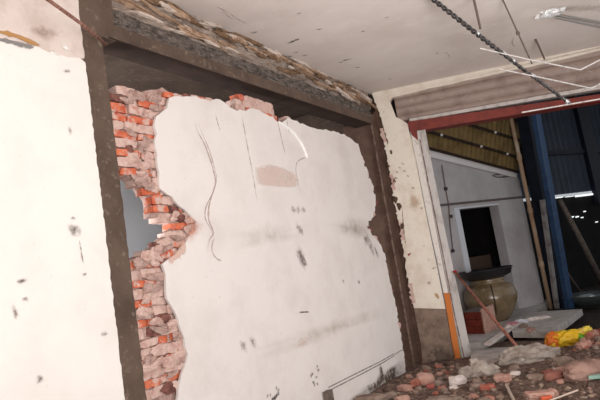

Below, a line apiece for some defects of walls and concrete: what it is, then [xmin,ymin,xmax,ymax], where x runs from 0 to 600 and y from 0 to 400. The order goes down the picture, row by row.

spalling [112,0,378,110]
flaking render [108,86,213,400]
crack [201,138,220,261]
spalling [380,128,415,304]